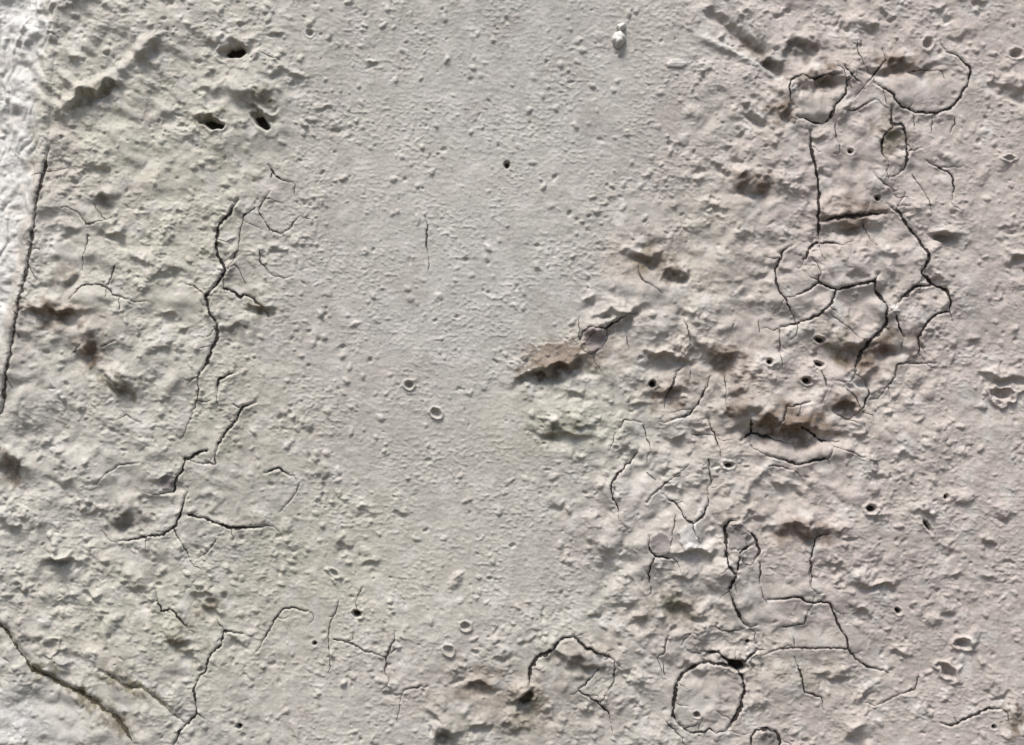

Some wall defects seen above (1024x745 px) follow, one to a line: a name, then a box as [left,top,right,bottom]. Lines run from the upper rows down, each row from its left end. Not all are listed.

crack [0,150,147,414]
crack [102,168,310,569]
spalling [525,326,614,376]
crack [578,313,636,370]
crack [610,41,972,745]
crack [139,587,423,743]
crack [528,631,621,733]
crack [943,707,1009,727]